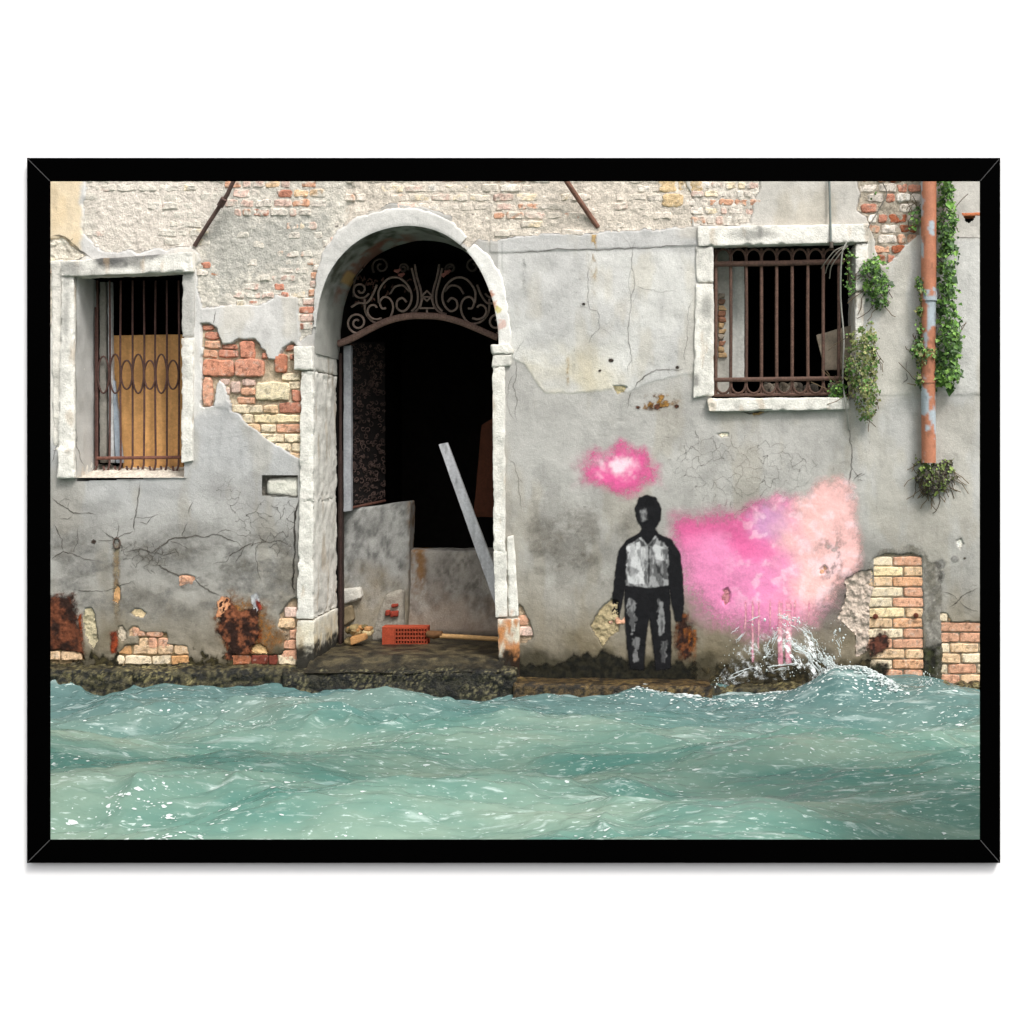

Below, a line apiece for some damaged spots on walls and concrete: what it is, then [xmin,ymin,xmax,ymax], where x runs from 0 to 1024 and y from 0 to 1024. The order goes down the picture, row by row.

peeling [857,181,921,265]
peeling [82,181,761,458]
crack [54,485,298,594]
rust [51,593,84,654]
flaking render [117,609,189,665]
rust [214,596,286,660]
rust [674,613,697,660]
flaking render [838,554,924,675]
flaking render [940,613,980,683]